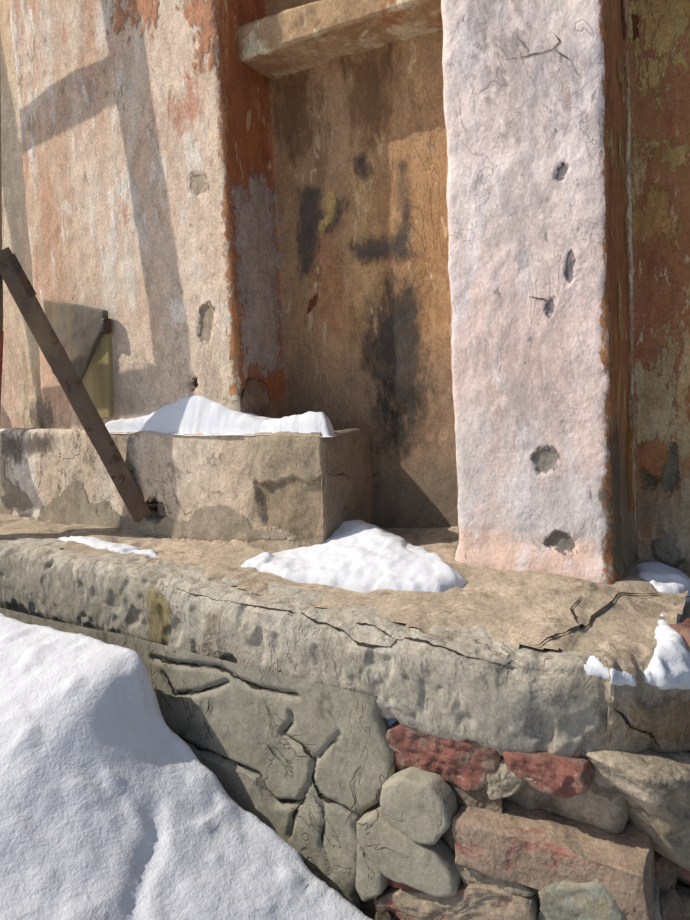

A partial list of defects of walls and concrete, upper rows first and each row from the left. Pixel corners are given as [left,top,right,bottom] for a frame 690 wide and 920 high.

peeling [105,0,158,44]
crack [506,32,581,78]
peeling [175,0,287,403]
peeling [598,0,690,585]
water stain [363,279,434,457]
peeling [0,457,325,547]
crack [174,588,513,695]
crack [534,592,690,646]
crack [156,657,360,858]